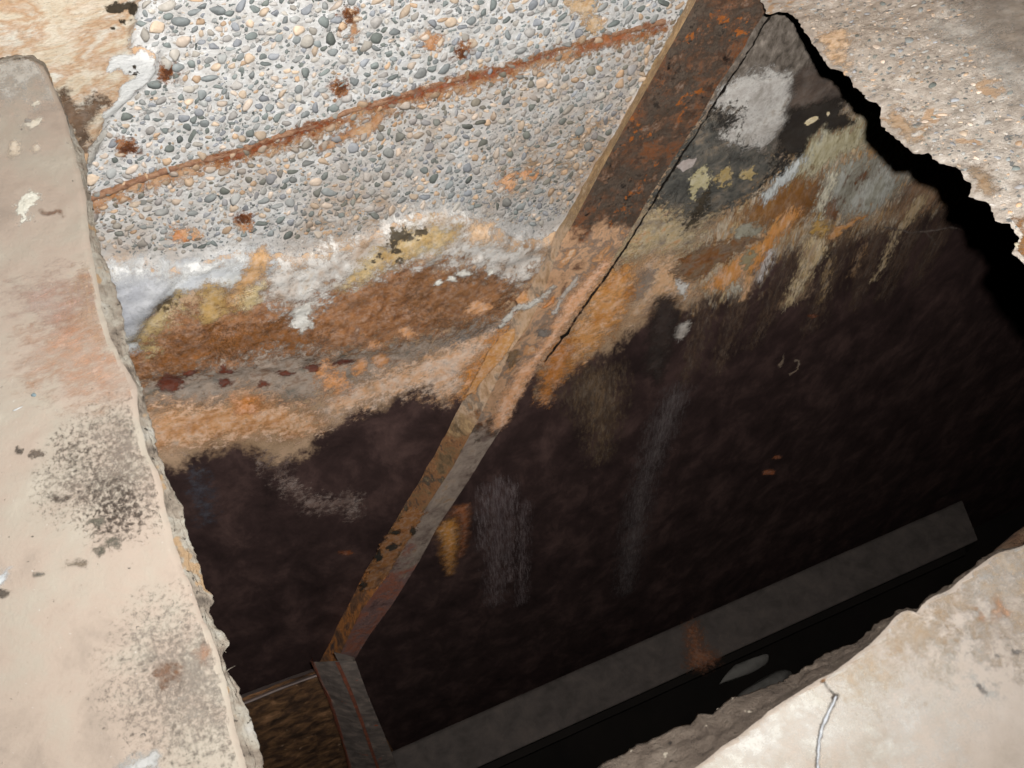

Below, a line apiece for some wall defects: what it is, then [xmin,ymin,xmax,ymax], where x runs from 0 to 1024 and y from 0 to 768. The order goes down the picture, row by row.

corrosion [233,211,255,232]
corrosion [129,249,534,459]
leakage [106,191,578,413]
corrosion [92,0,669,214]
crack [544,14,772,362]
leakage [609,64,972,343]
leakage [257,456,364,522]
leakage [474,478,532,606]
spalling [597,544,1024,768]
leakage [723,642,916,768]